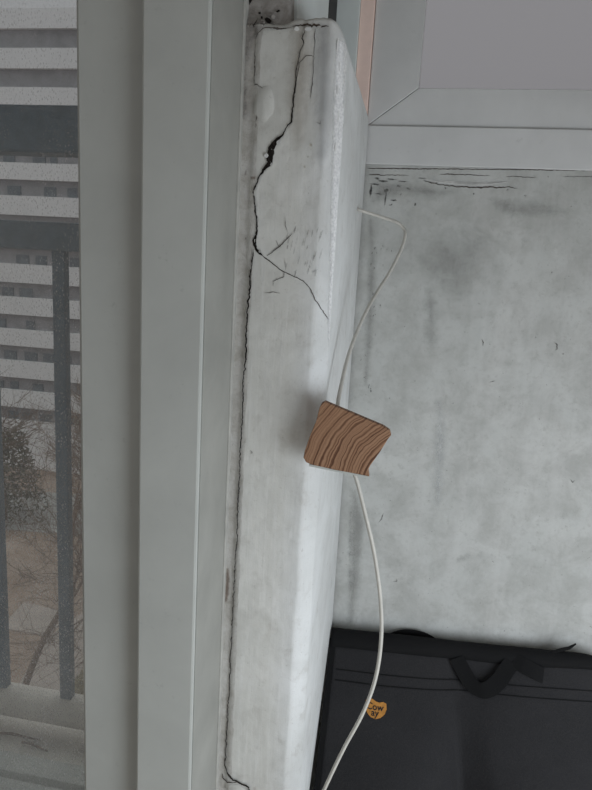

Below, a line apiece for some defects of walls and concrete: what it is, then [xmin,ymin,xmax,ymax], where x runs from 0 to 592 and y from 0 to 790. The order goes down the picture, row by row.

crack [223,27,328,790]